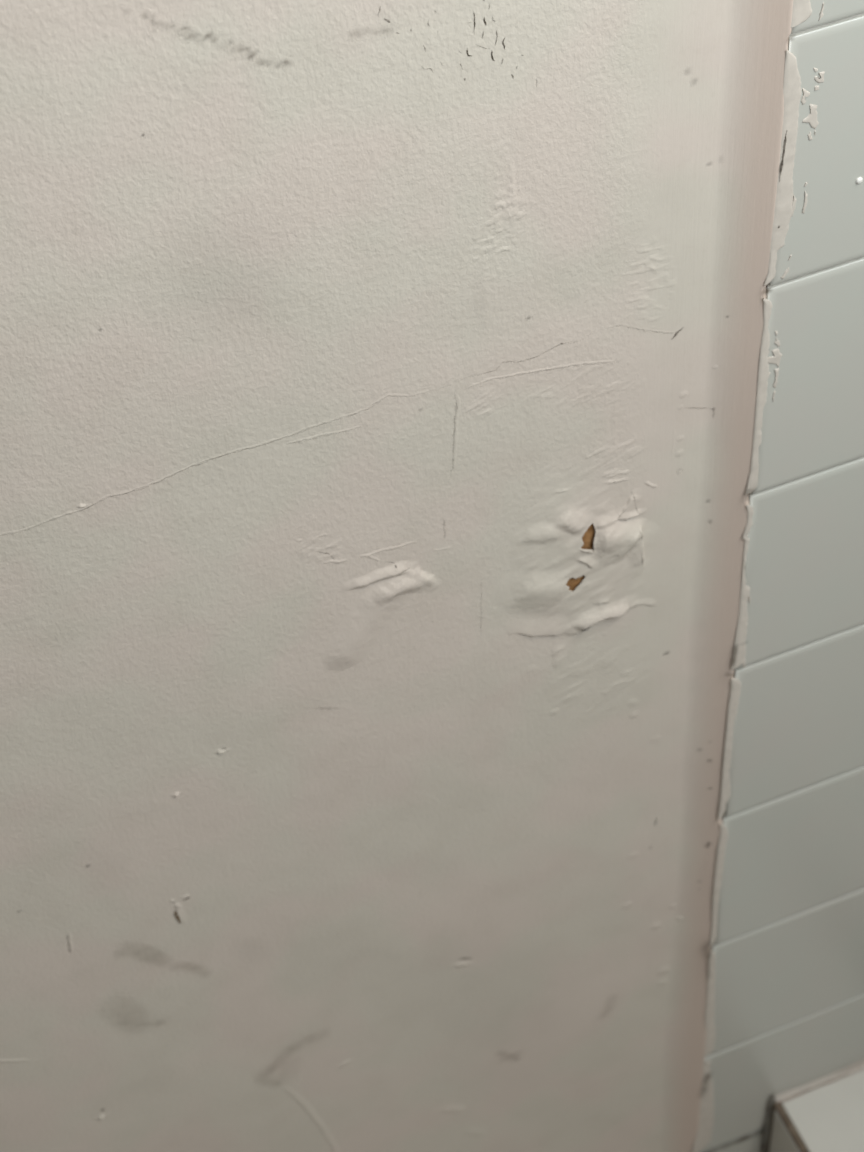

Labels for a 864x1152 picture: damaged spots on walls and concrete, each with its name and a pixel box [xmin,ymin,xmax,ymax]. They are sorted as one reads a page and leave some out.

peeling [801,68,825,140]
crack [0,323,681,536]
peeling [490,455,662,644]